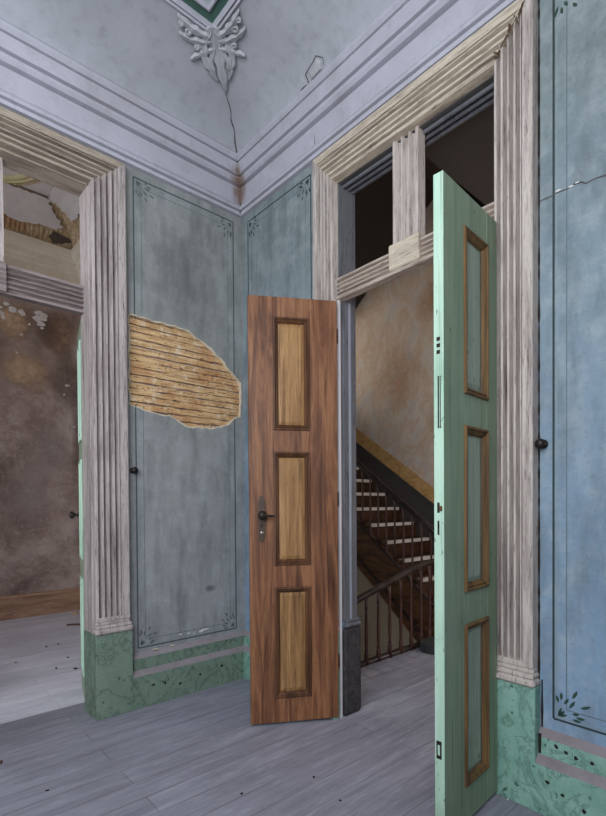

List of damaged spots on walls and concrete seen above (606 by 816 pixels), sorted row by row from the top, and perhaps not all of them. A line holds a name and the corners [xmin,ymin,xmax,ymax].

crack [226,95,238,163]
peeling [3,182,80,244]
peeling [0,302,72,352]
flaking render [128,314,242,429]